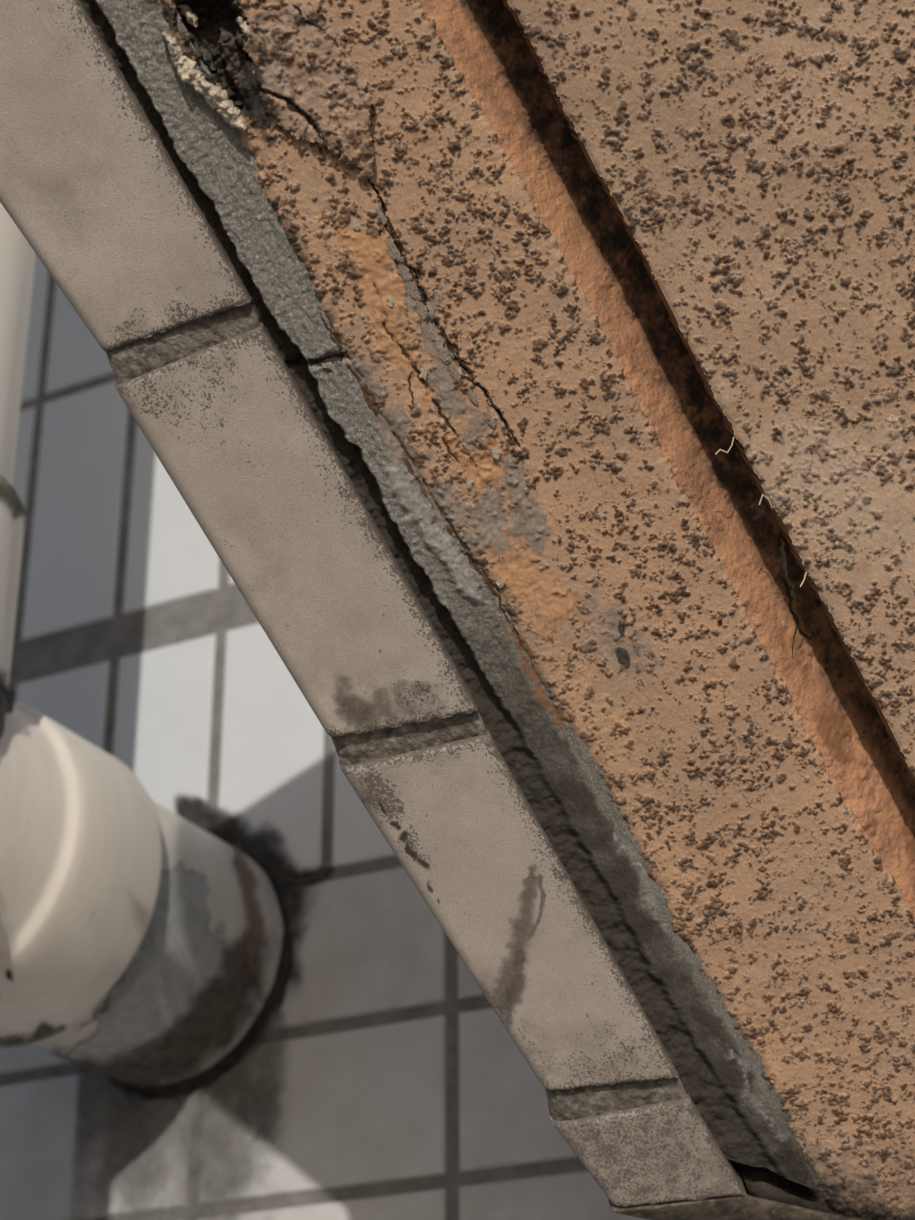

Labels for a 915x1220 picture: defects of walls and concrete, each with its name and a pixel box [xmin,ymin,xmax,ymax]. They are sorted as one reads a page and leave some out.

peeling [162,0,374,180]
crack [292,179,520,642]
damp [495,867,546,1024]